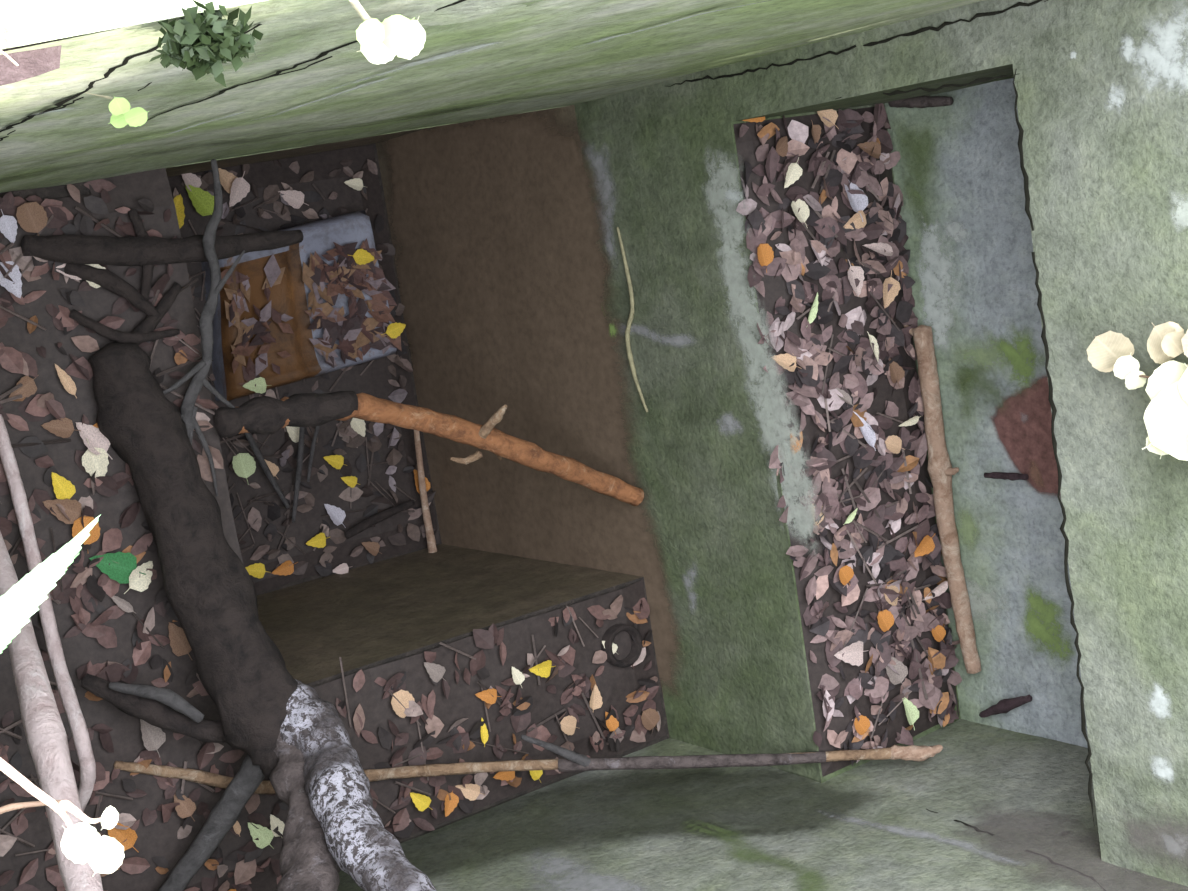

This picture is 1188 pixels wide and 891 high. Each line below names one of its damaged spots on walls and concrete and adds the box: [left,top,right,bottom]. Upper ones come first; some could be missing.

crack [0,43,163,141]
crack [147,40,358,121]
crack [434,0,466,12]
crack [667,0,1048,87]